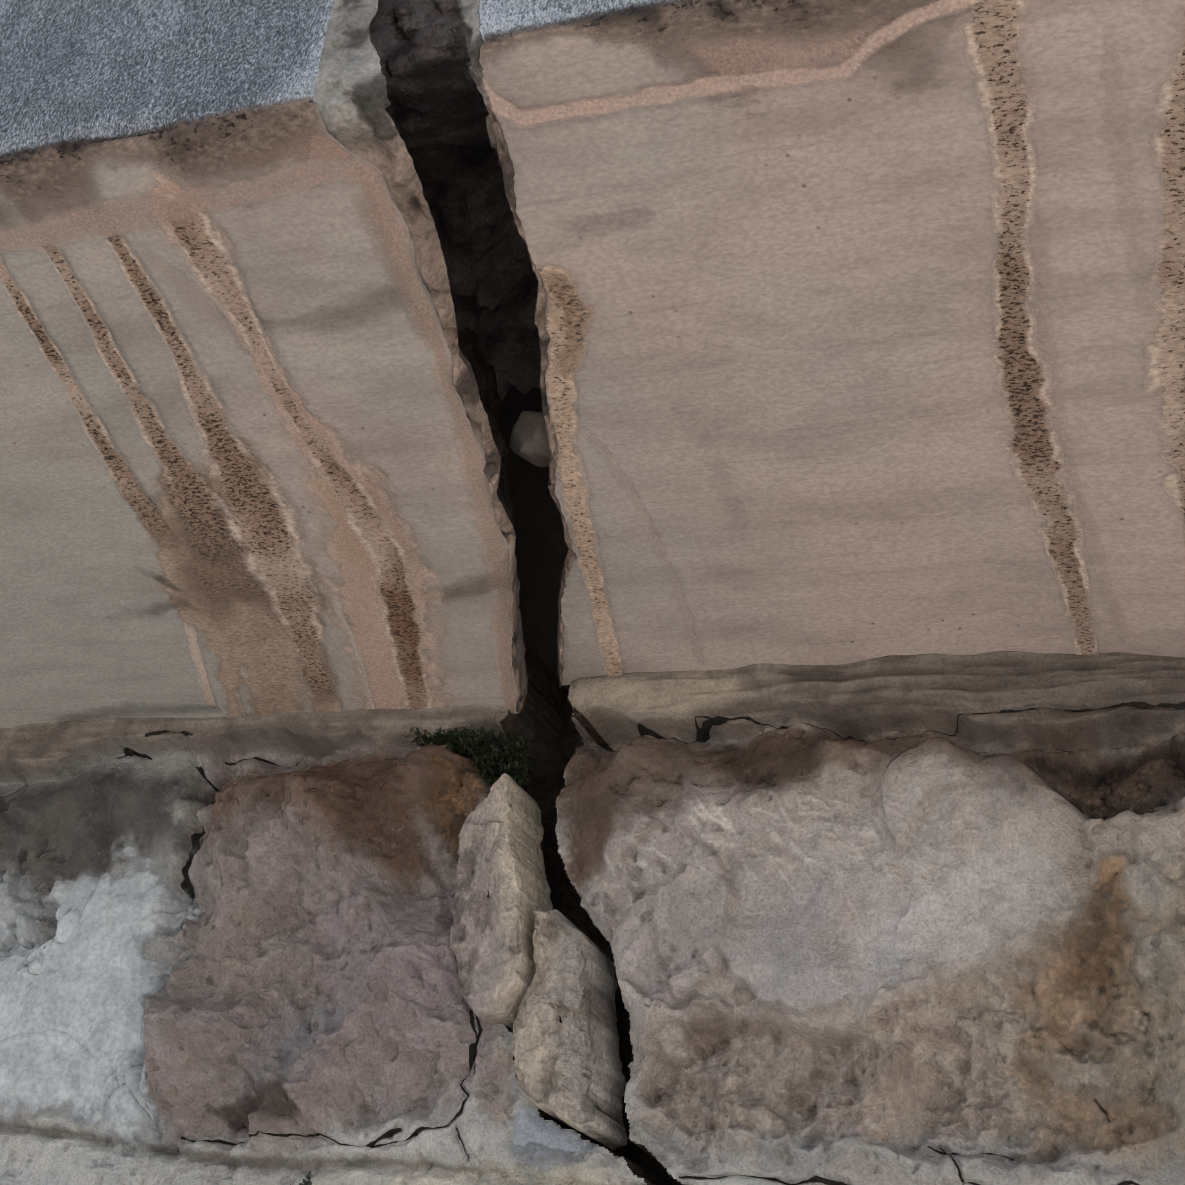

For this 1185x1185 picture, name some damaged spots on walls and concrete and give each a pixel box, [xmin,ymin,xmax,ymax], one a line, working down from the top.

damp [0,97,516,718]
crack [370,0,541,404]
damp [481,0,1097,664]
damp [1146,38,1185,532]
crack [180,1008,517,1183]
crack [421,635,847,1185]
crack [637,701,1185,744]
crack [928,1146,1013,1185]
crack [1094,1099,1111,1123]
crack [1118,1177,1139,1185]